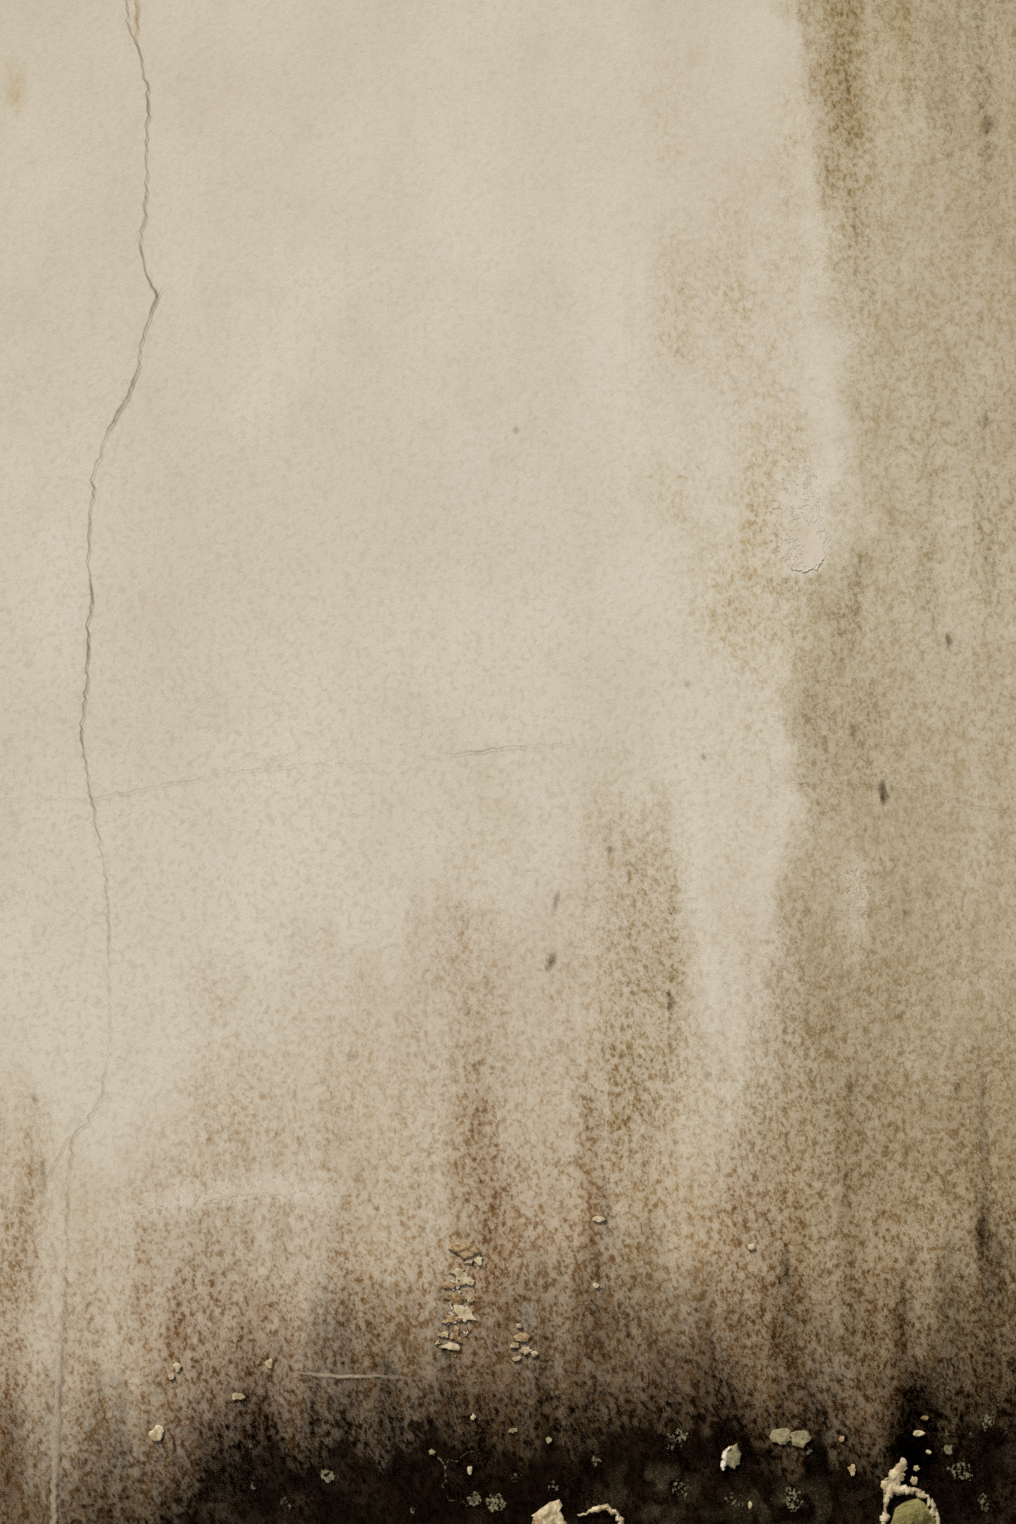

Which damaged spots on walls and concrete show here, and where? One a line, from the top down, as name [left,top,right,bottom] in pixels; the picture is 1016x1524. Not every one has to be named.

leakage [0,1179,1016,1524]
crack [51,1366,61,1524]
flaking render [531,1499,624,1524]
flaking render [720,1443,742,1470]
flaking render [770,1428,812,1448]
flaking render [880,1416,940,1524]